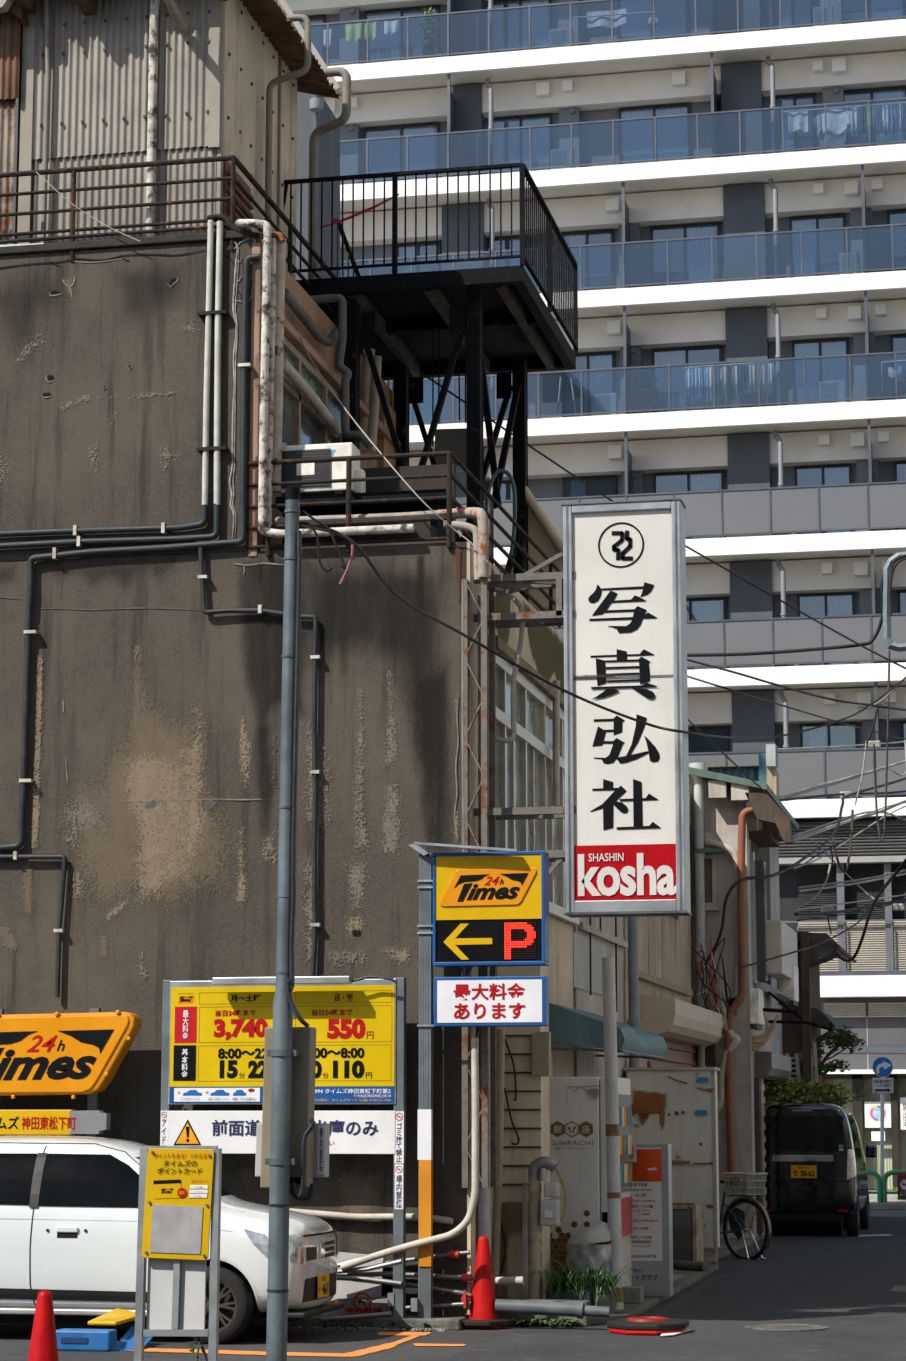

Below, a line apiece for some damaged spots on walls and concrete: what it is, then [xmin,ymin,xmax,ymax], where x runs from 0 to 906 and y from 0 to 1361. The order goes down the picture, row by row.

corrosion [0,12,21,100]
leakage [58,391,176,480]
leakage [236,824,277,902]
leakage [237,563,284,815]
leakage [345,686,403,913]
leakage [312,556,445,844]